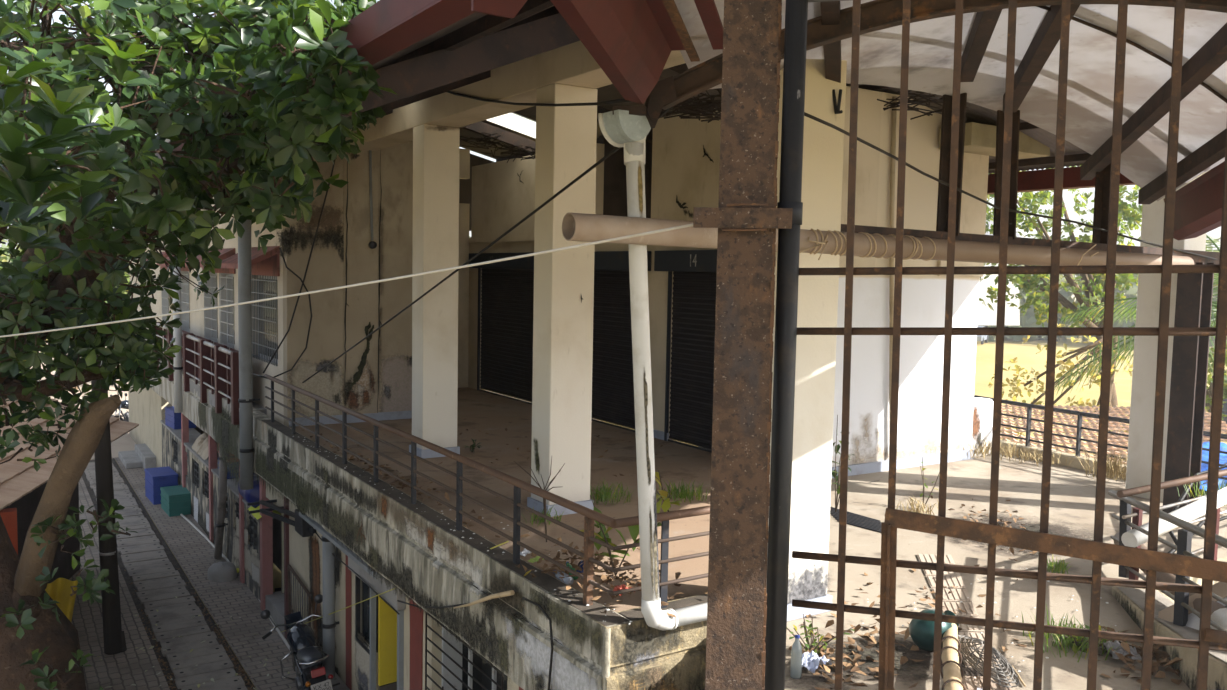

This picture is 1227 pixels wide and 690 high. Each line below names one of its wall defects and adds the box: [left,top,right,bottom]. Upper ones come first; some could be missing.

leakage [277,206,344,261]
leakage [267,430,291,474]
leakage [297,462,702,690]
leakage [643,371,659,598]
rust [761,229,776,690]